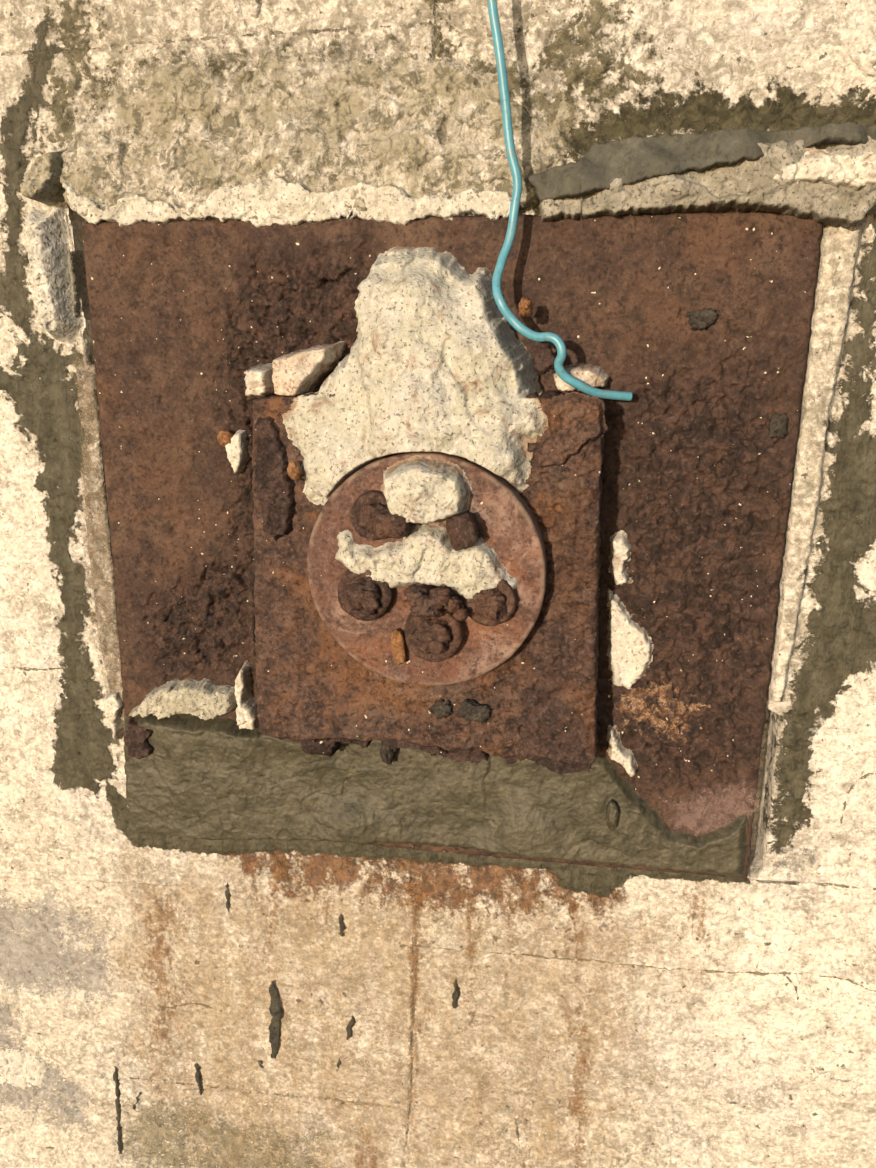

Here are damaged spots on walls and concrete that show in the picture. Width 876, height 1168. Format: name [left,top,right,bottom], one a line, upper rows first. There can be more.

crack [1,27,347,56]
crack [380,3,438,62]
spalling [62,177,512,228]
spalling [535,136,876,229]
corrosion [532,342,556,375]
corrosion [217,429,234,447]
spalling [282,246,548,599]
corrosion [613,675,710,743]
corrosion [288,738,489,764]
peeling [772,837,815,875]
corrosion [217,851,626,1006]
crack [130,905,876,1134]